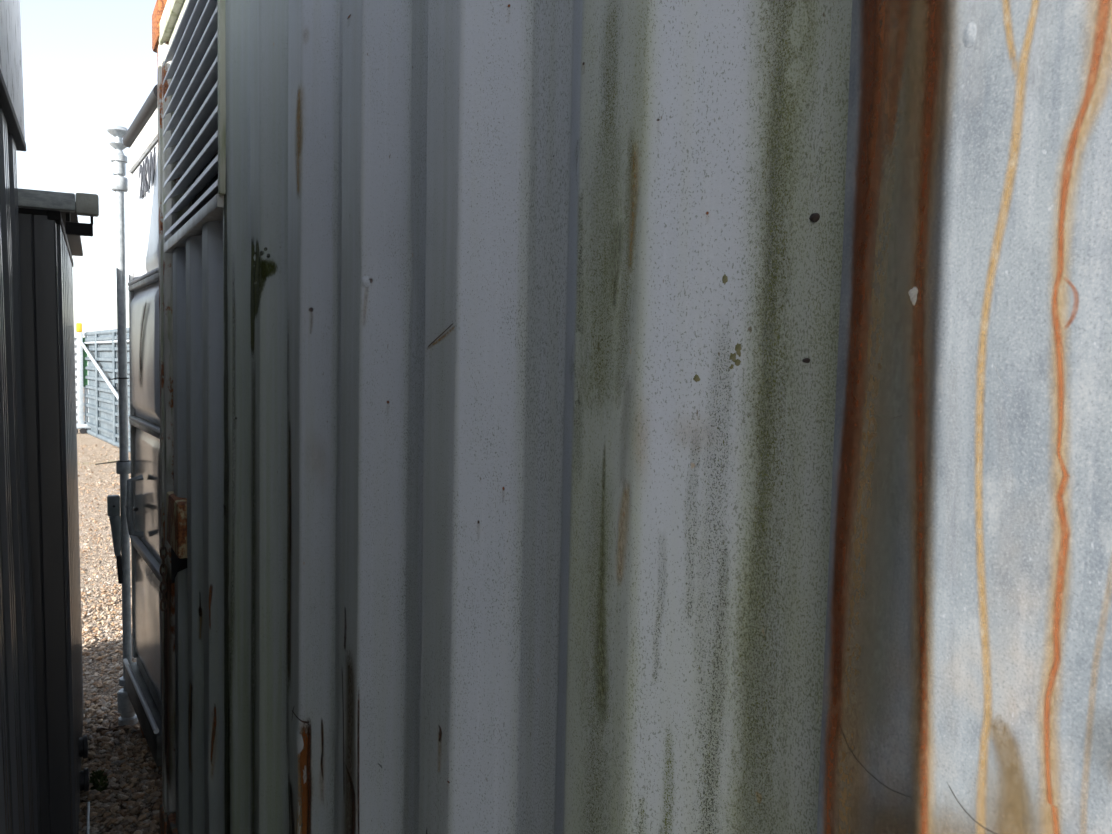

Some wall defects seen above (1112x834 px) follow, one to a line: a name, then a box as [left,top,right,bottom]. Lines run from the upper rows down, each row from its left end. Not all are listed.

rust [290,708,323,834]
rust [342,608,359,834]
rust [825,0,946,834]
rust [1043,0,1112,834]